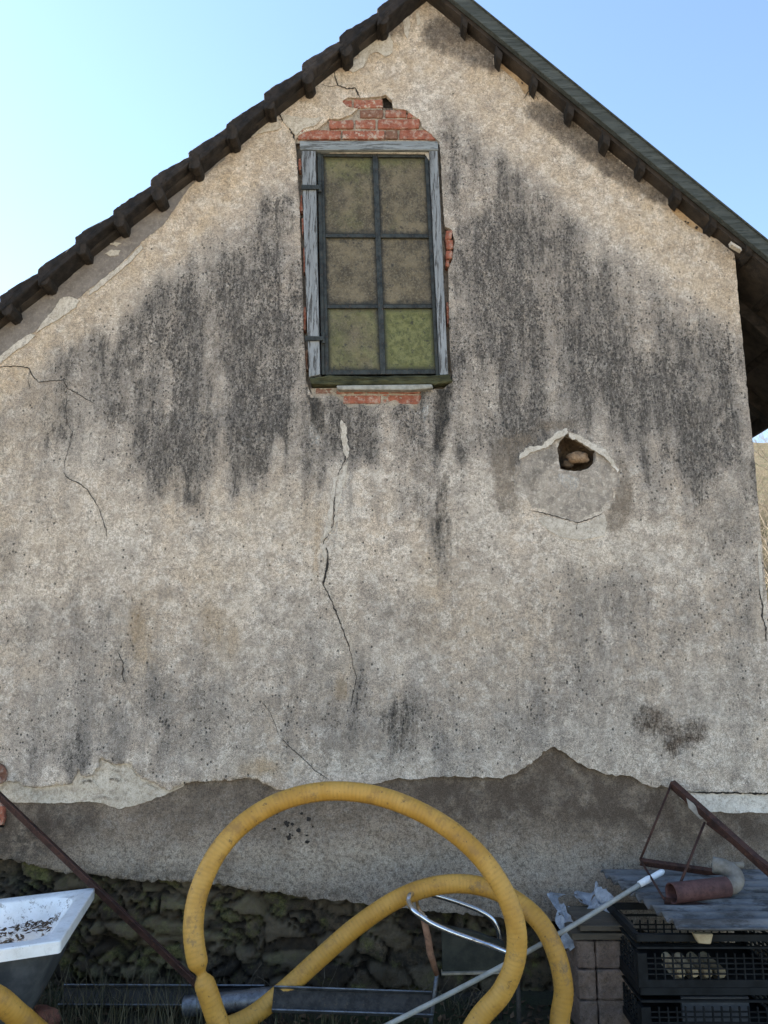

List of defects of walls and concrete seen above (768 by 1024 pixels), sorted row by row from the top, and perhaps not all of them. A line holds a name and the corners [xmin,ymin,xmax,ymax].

spalling [251,98,439,145]
spalling [444,230,454,271]
peeling [0,242,143,365]
crack [3,366,107,536]
spalling [310,388,421,411]
damp [427,386,450,456]
spalling [493,423,633,541]
crack [319,419,357,707]
peeling [0,758,184,825]
spalling [273,812,314,844]
peeling [680,790,768,813]